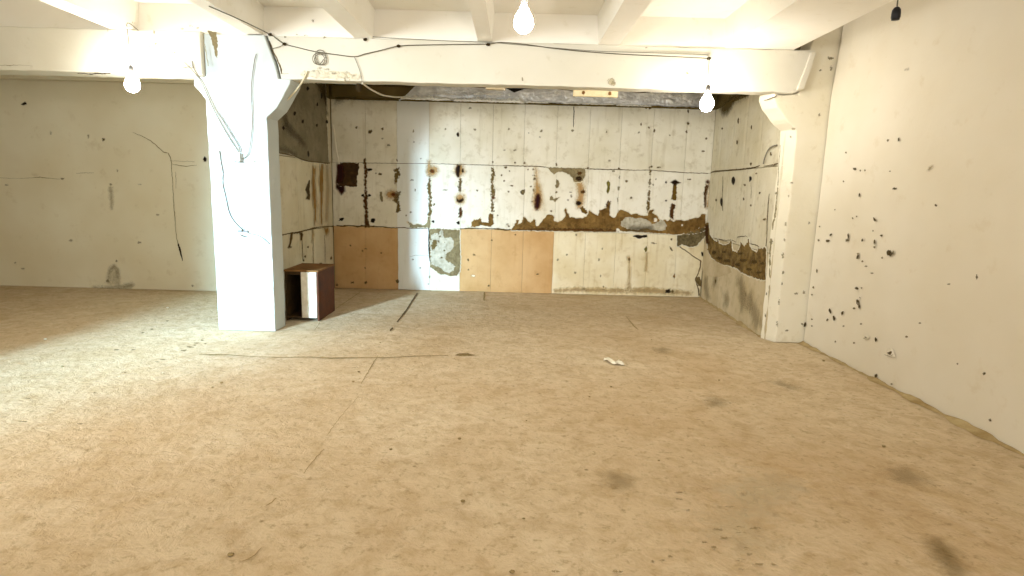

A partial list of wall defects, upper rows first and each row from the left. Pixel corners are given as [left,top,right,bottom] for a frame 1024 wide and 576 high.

crack [133,132,195,261]
corrosion [311,165,324,224]
flaking render [279,153,360,195]
corrosion [361,159,375,228]
corrosion [533,171,541,210]
spalling [375,149,767,281]
corrosion [576,178,587,214]
corrosion [665,180,681,219]